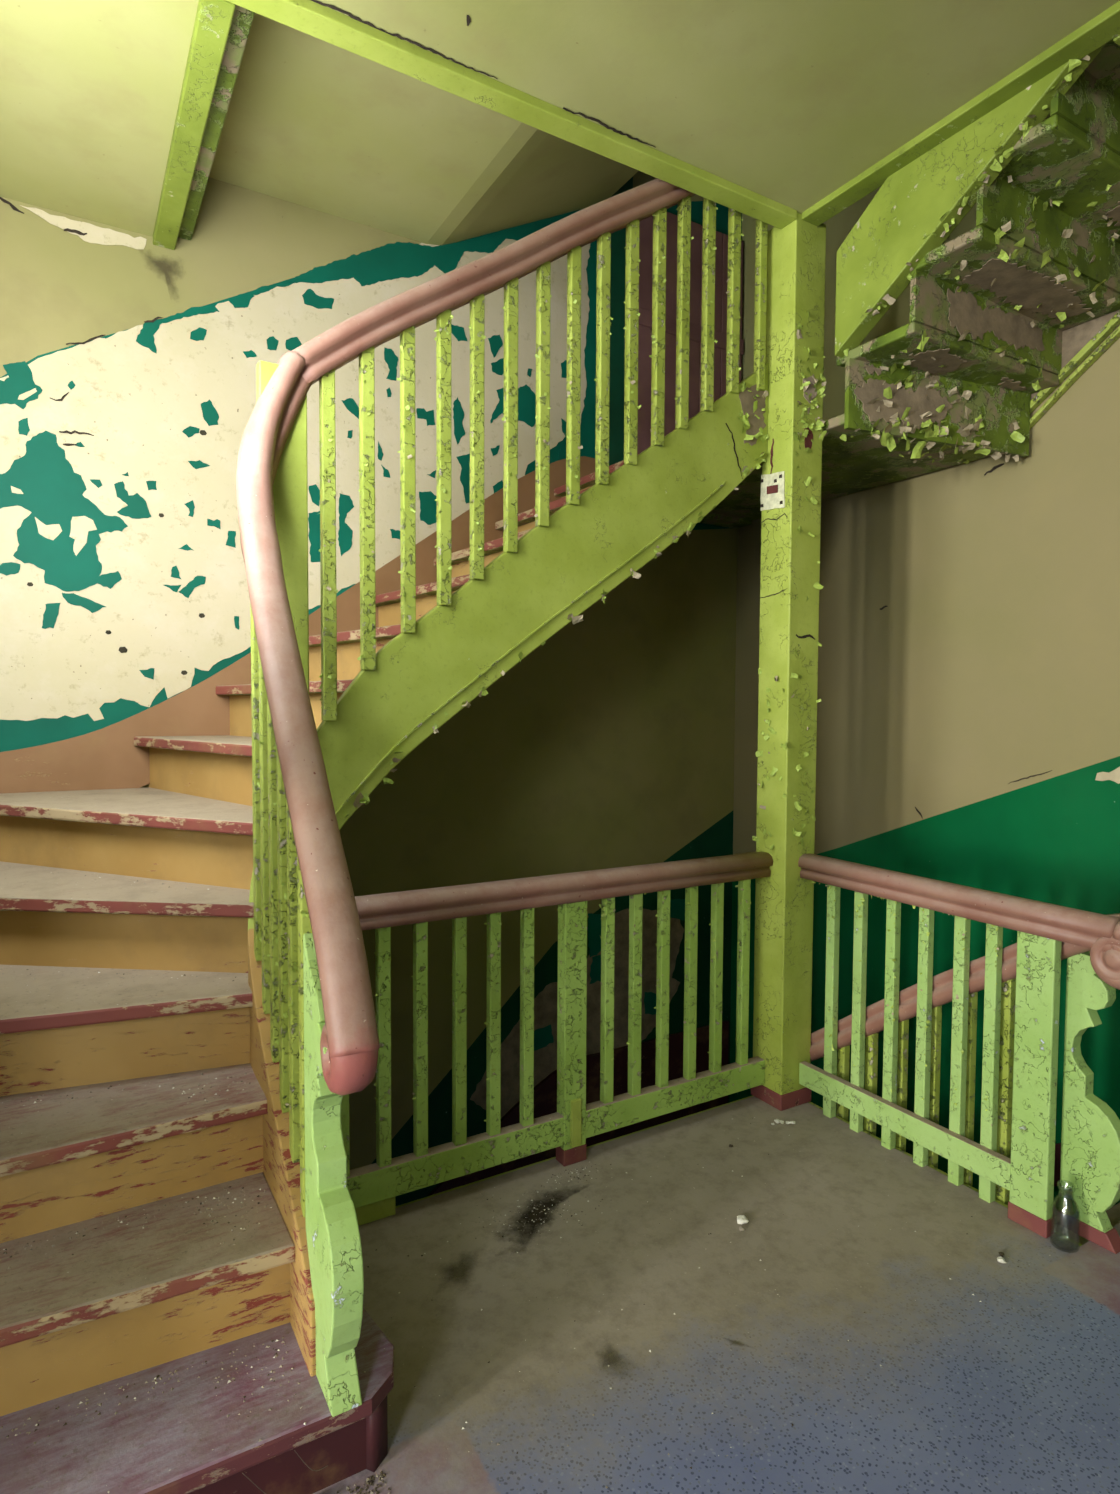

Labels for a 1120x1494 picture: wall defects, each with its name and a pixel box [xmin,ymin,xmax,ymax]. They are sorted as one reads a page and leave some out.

crack [0,197,24,214]
crack [64,228,87,236]
peeling [923,55,1090,240]
peeling [0,205,582,721]
peeling [307,202,769,609]
peeling [793,179,1120,504]
peeling [432,687,488,734]
peeling [752,669,816,850]
peeling [1095,767,1120,784]